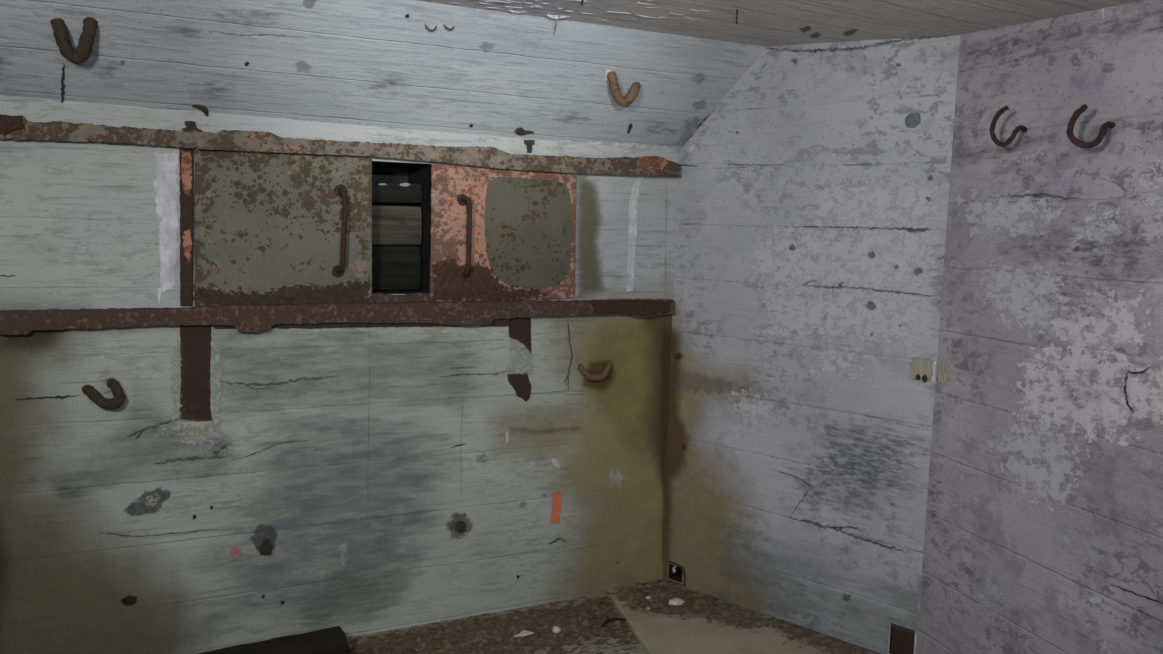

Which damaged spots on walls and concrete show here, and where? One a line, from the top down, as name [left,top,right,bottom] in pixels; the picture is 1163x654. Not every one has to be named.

peeling [479,0,589,20]
peeling [603,0,710,21]
rust [430,255,550,301]
spalling [508,339,533,374]
crack [1124,367,1150,411]
leakage [542,315,757,611]
crack [772,469,909,552]